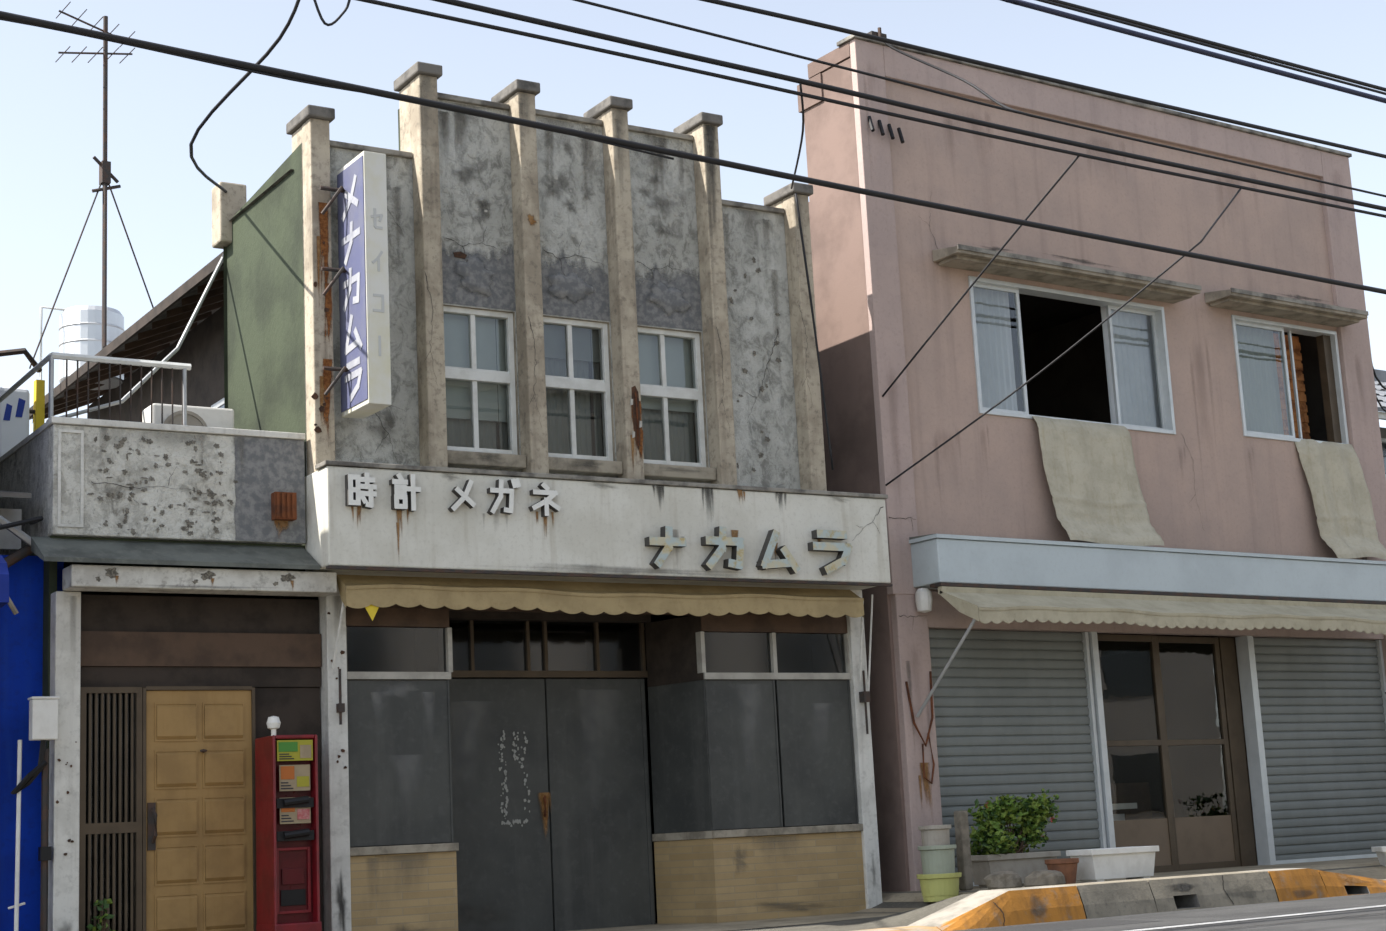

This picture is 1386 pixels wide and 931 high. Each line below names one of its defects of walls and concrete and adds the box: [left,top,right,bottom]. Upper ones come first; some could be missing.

leakage [706,125,715,184]
corrosion [317,202,332,337]
peeling [87,392,329,543]
corrosion [396,509,409,552]
corrosion [918,763,931,801]